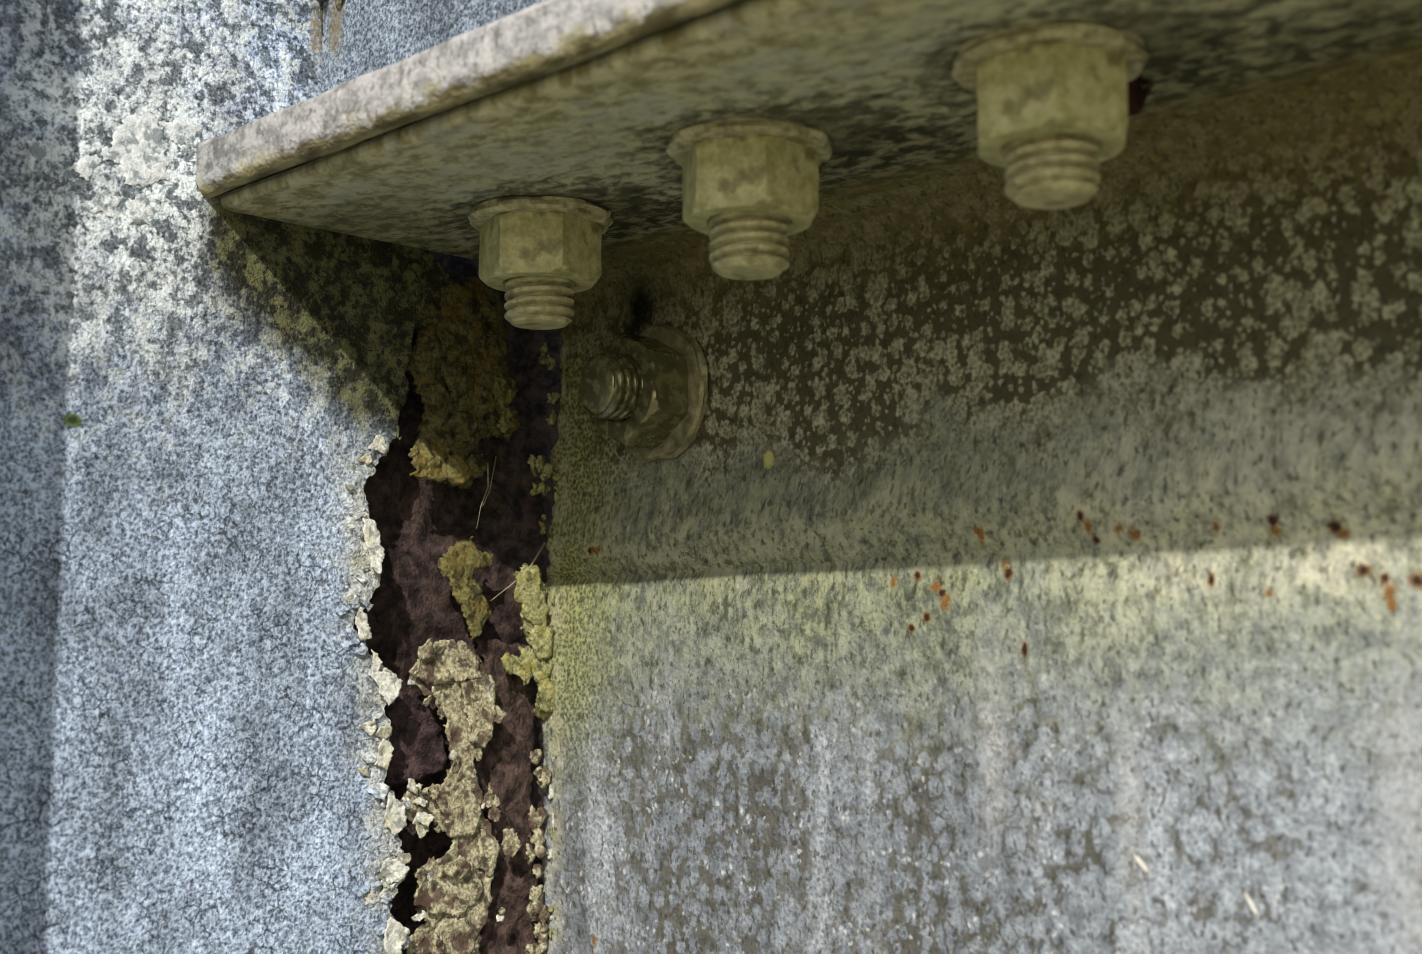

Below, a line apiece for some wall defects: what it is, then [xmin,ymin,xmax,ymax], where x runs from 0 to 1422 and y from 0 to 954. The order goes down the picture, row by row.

crack [321,0,342,10]
rust [1076,511,1100,544]
rust [1114,524,1139,540]
rust [1268,514,1280,537]
rust [1328,520,1349,539]
rust [908,571,950,632]
rust [1356,564,1422,611]
peeling [500,652,531,685]